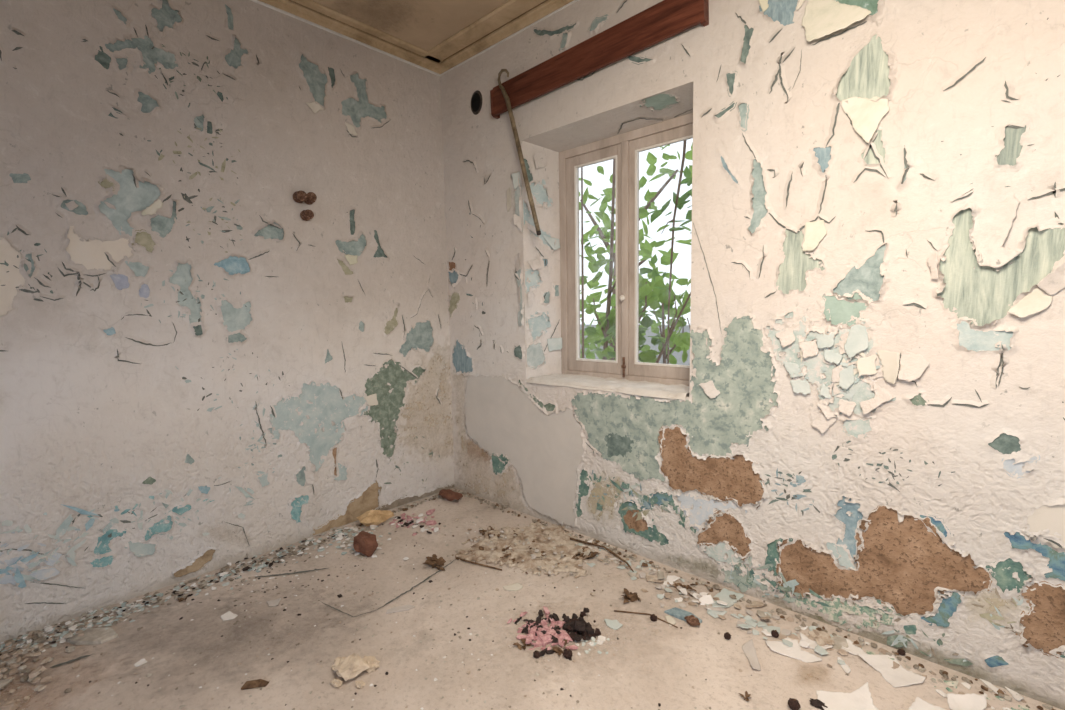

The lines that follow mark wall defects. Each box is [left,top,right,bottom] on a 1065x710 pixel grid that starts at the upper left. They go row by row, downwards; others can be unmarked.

peeling [0,0,313,381]
peeling [0,301,455,592]
peeling [331,206,391,335]
peeling [451,337,475,376]
peeling [447,259,486,320]
peeling [507,0,1065,710]